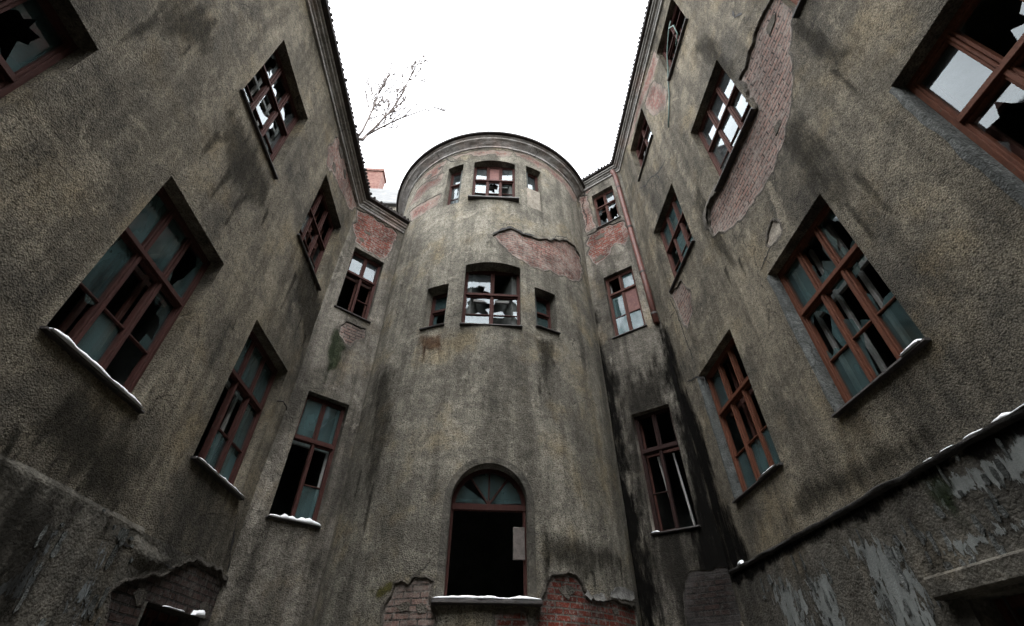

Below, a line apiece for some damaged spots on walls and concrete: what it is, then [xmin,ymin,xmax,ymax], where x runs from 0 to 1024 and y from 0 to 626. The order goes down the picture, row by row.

water stain [205,114,268,223]
flaking render [326,134,399,260]
flaking render [409,149,630,283]
flaking render [707,0,795,238]
flaking render [765,218,783,248]
water stain [545,325,954,626]
water stain [965,419,1024,459]
flaking render [63,525,227,626]
flaking render [379,573,439,626]
flaking render [491,569,638,626]
peeling [759,552,848,626]
peeling [843,435,1024,626]